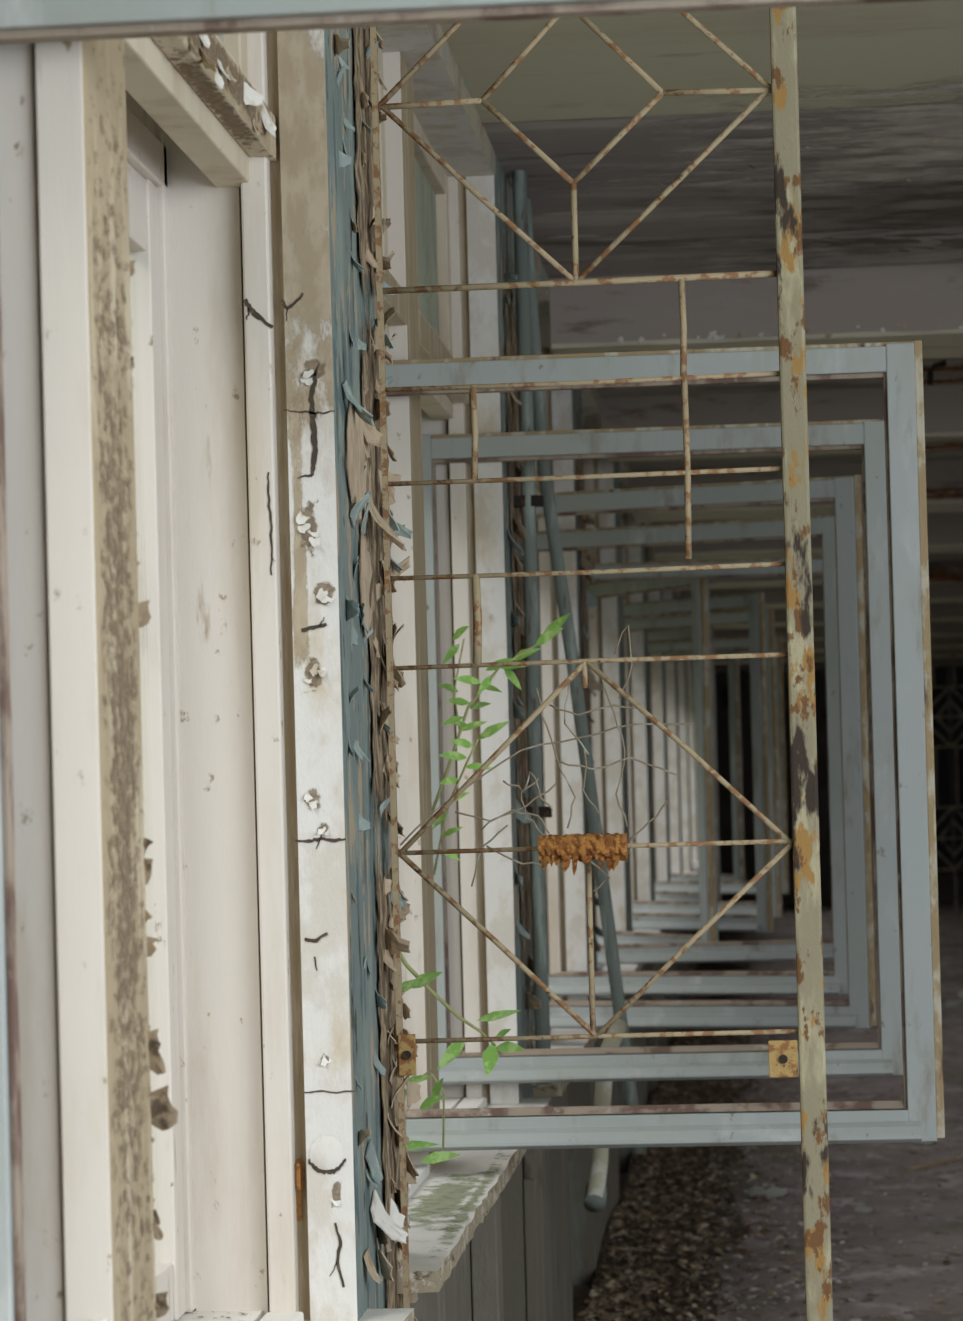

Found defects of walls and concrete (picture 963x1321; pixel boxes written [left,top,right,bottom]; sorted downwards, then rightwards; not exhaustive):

peeling [161,35,277,157]
damp [802,182,963,254]
spalling [300,359,326,386]
spalling [296,500,320,556]
peeling [89,114,178,1321]
peeling [313,27,421,1321]